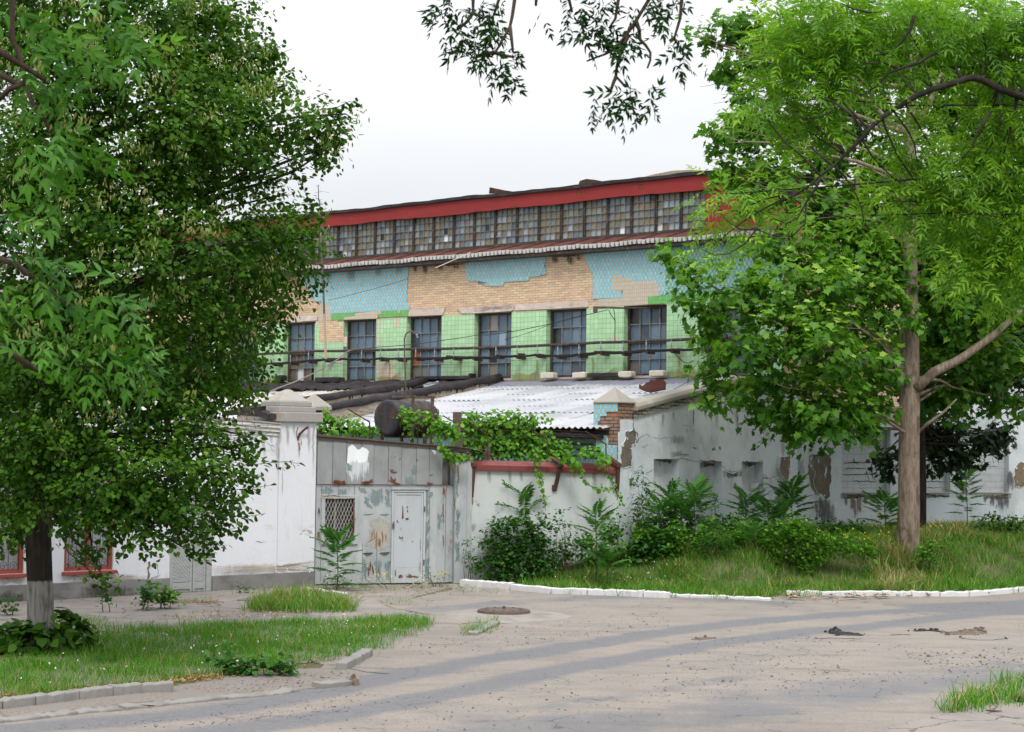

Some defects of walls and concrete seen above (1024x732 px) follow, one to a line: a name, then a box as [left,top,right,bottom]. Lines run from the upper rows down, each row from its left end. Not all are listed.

spalling [598,275,659,307]
corrosion [639,379,666,393]
spalling [619,429,638,489]
crack [633,412,777,495]
spalling [777,456,791,485]
spalling [810,453,832,500]
leakage [808,455,884,525]
spalling [1013,461,1024,489]